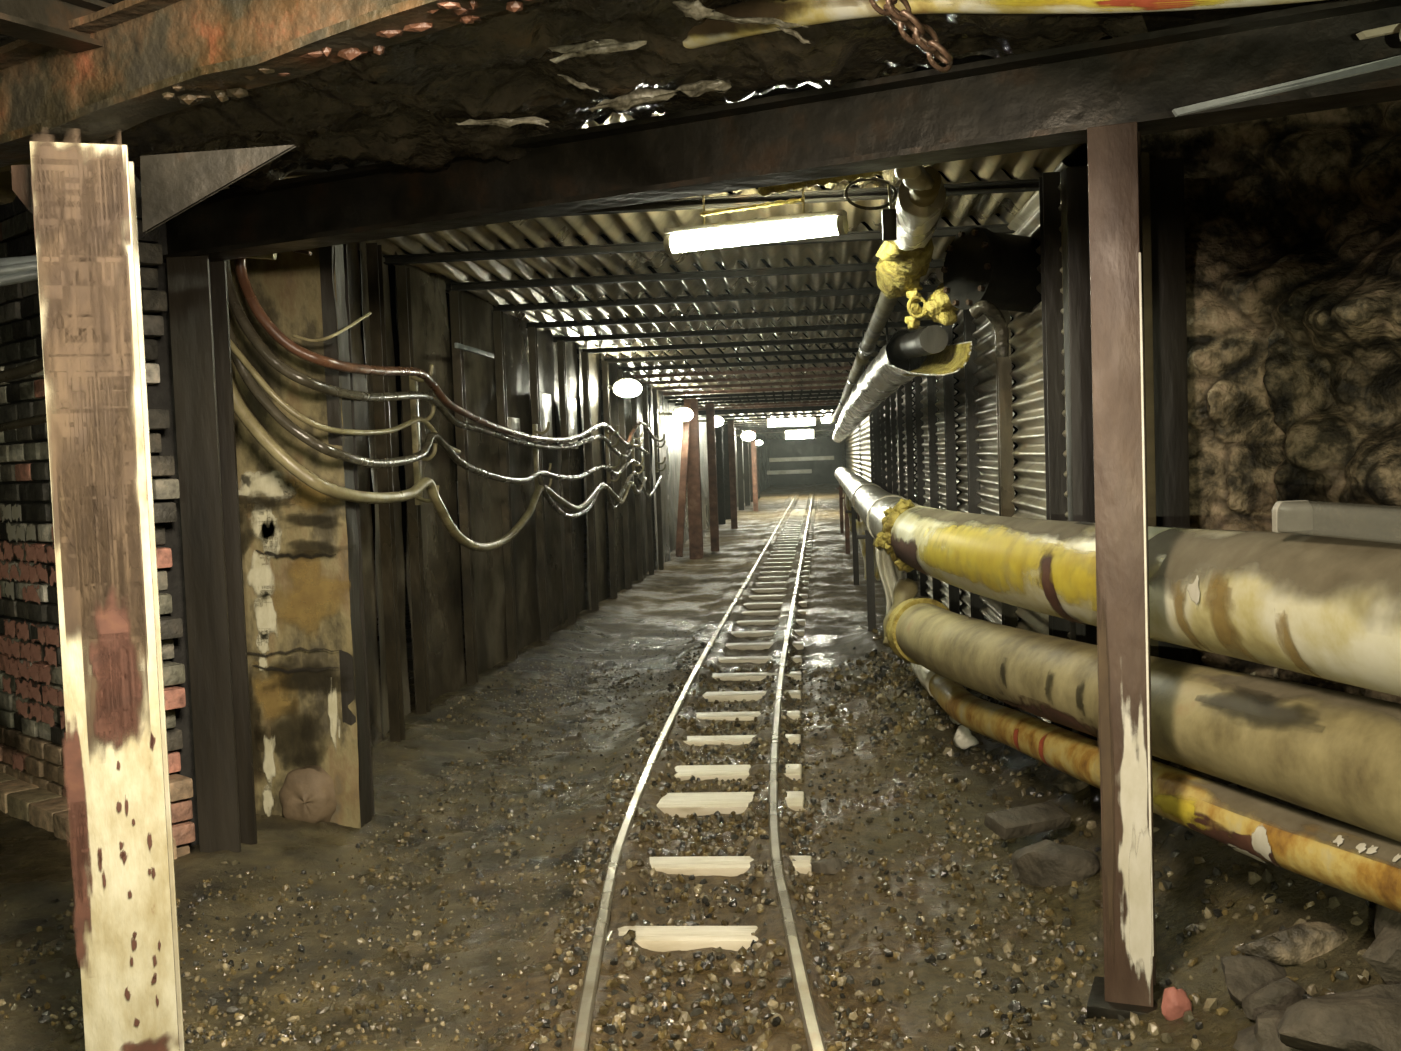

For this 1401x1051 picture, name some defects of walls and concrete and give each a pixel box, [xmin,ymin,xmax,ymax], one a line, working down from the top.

rust [1096,0,1200,10]
rust [31,134,155,967]
peeling [1118,700,1153,988]
rust [1186,812,1282,868]
rust [151,940,161,1006]
rust [122,1018,169,1051]